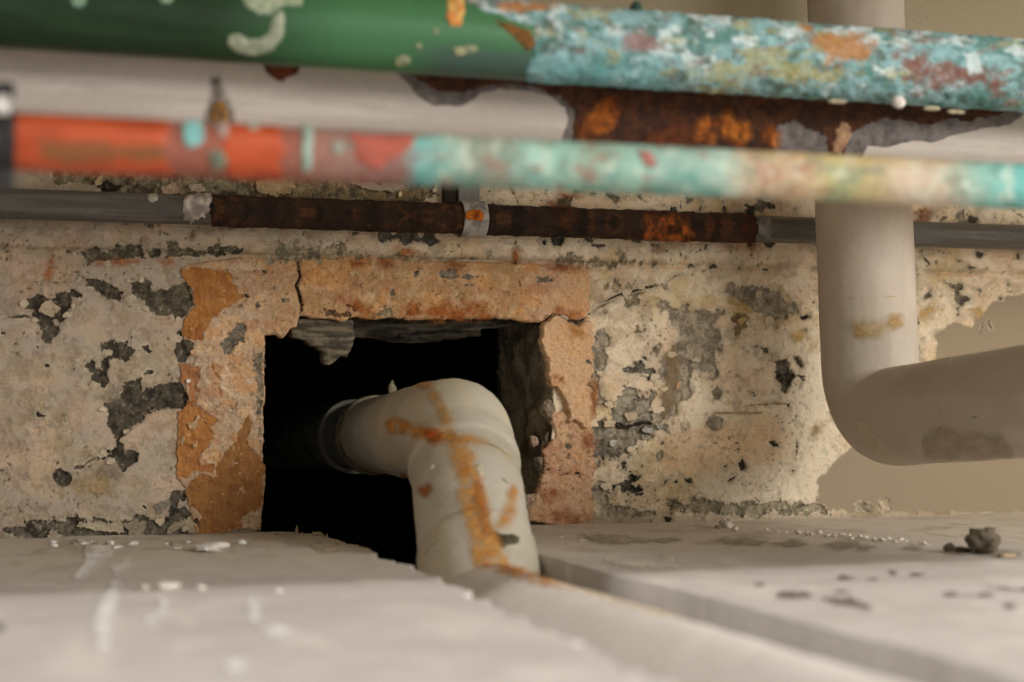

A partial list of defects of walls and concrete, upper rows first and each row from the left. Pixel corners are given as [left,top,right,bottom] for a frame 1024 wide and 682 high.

rust [408,74,1008,155]
spalling [85,336,152,390]
spalling [1,240,247,363]
spalling [96,370,190,472]
peeling [249,350,266,435]
crack [294,261,304,312]
spalling [261,232,492,286]
flaking render [289,289,546,365]
spalling [542,237,831,522]
spalling [945,280,981,317]
spalling [52,461,84,488]
spalling [2,490,201,538]